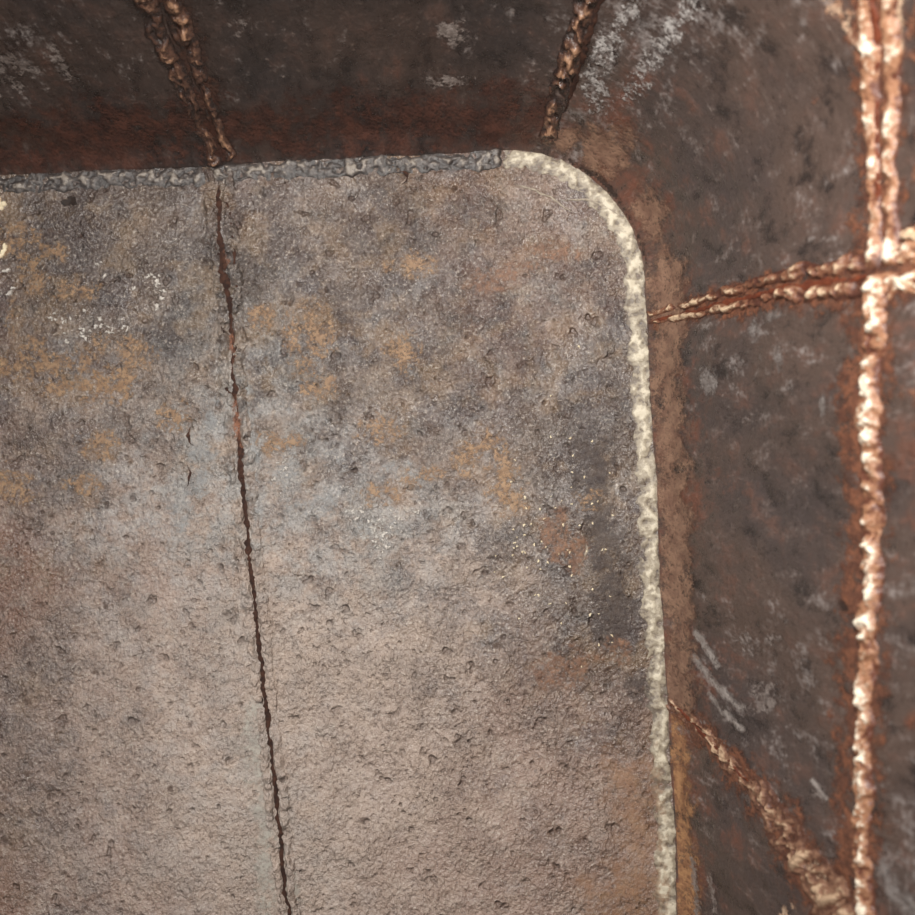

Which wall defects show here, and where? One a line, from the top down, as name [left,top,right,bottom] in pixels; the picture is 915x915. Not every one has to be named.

crack [566,0,605,108]
water stain [580,1,639,114]
water stain [622,0,704,101]
crack [869,0,882,74]
crack [872,100,882,229]
crack [652,274,869,322]
crack [215,184,292,915]
crack [671,704,749,782]